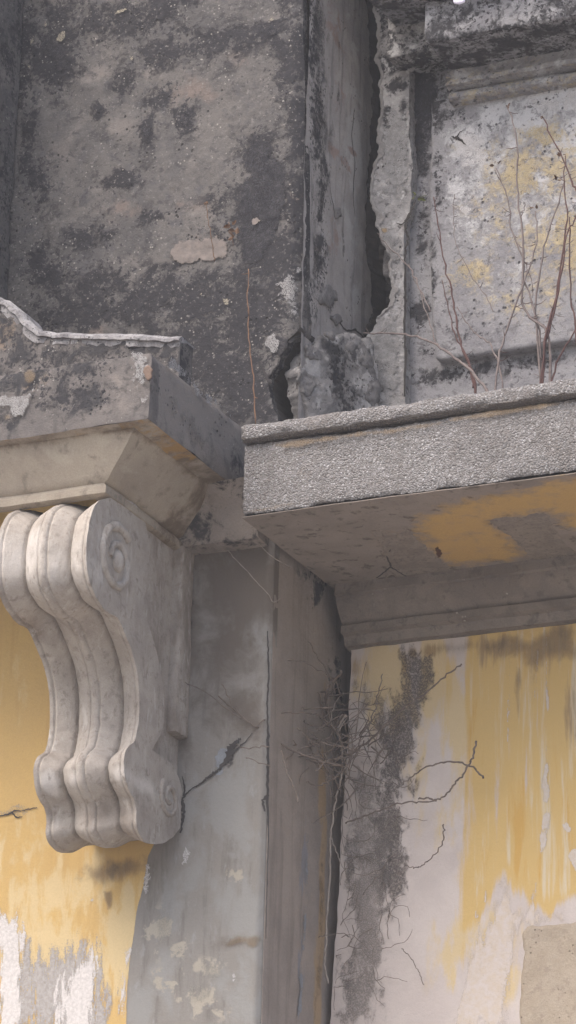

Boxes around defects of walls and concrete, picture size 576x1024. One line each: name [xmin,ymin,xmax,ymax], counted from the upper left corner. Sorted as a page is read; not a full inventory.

damp [237,135,287,262]
crack [259,0,416,421]
flaking render [284,285,382,419]
crack [0,807,37,818]
crack [179,631,270,933]
damp [337,648,435,1024]
peeling [0,904,132,1024]